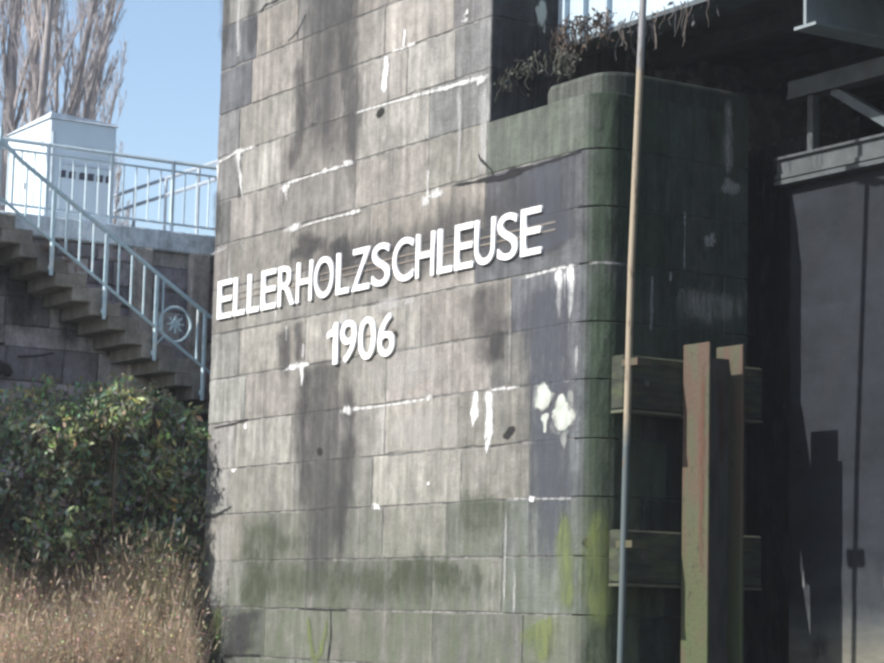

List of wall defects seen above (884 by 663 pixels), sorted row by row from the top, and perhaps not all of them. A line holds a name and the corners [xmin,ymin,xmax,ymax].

leakage [275,324,431,589]
leakage [522,265,574,604]